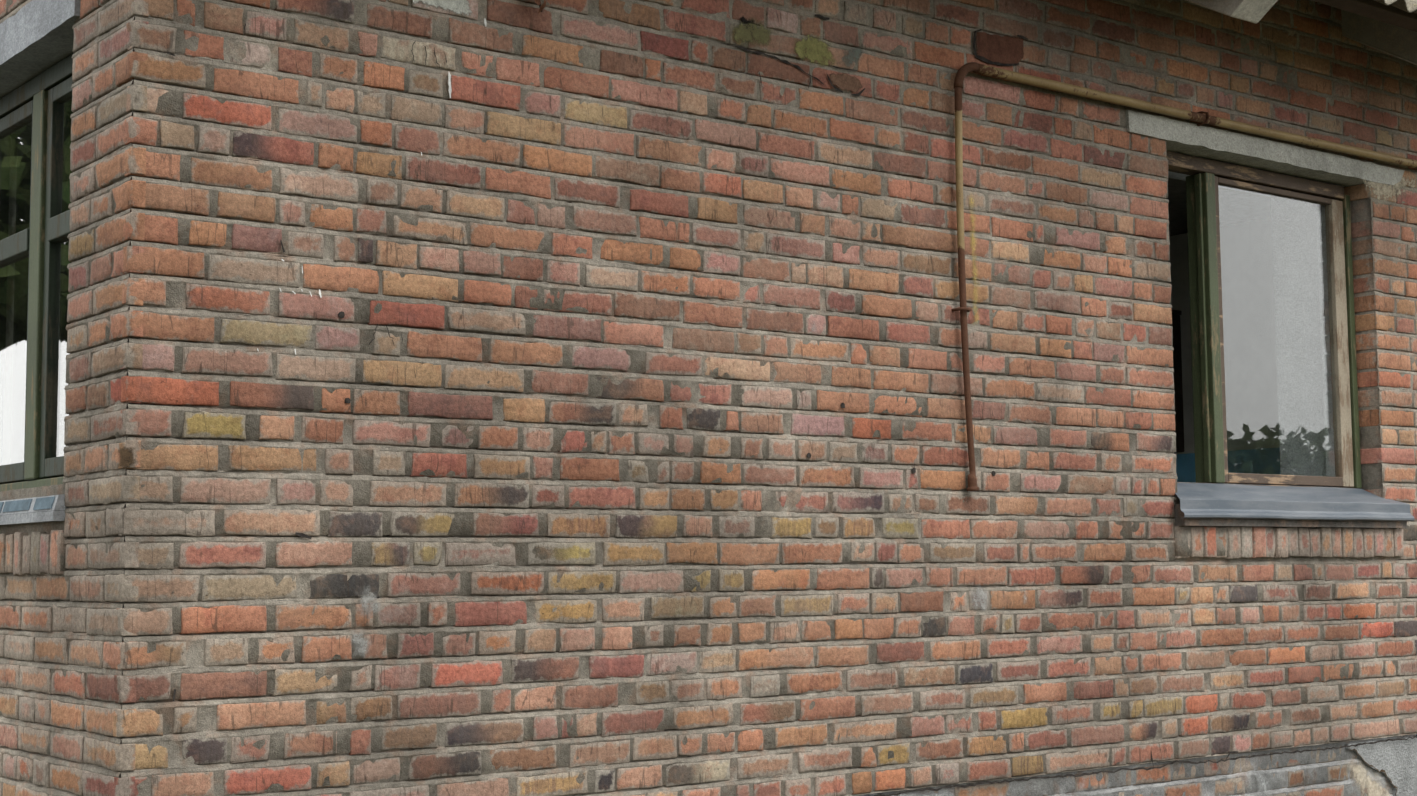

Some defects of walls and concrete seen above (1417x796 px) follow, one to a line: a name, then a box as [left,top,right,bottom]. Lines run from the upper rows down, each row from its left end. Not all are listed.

crack [874,736,1417,796]
spalling [882,734,1415,796]